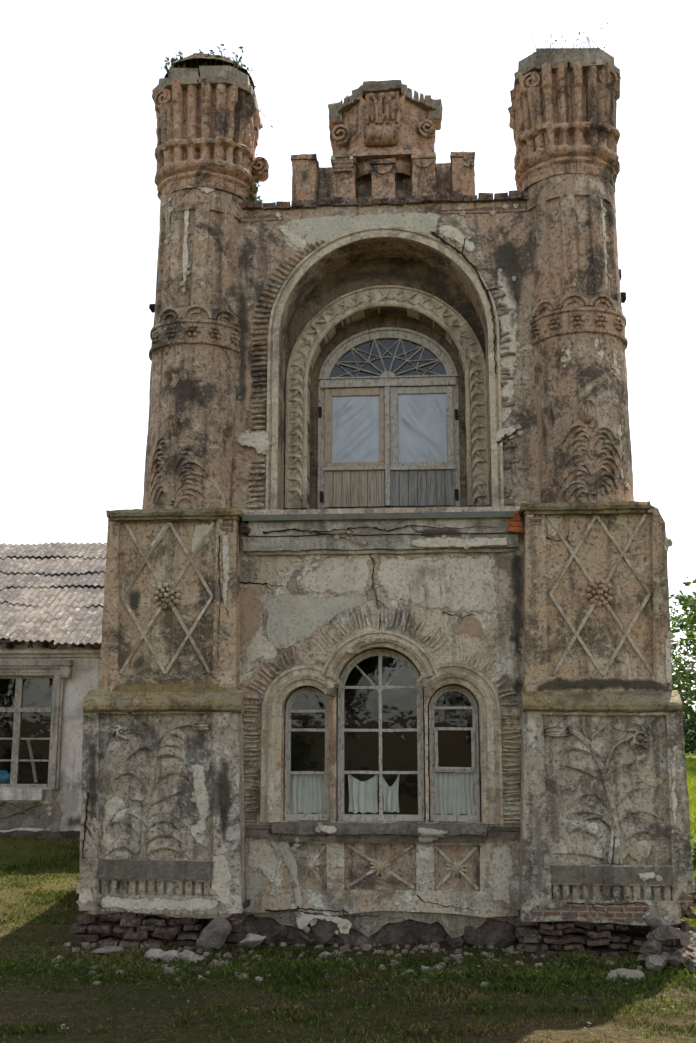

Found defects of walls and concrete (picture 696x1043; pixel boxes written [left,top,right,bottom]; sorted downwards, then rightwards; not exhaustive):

peeling [191,519,258,607]
crack [364,557,381,630]
crack [263,525,498,538]
peeling [286,530,508,616]
peeling [242,595,278,673]
peeling [74,761,236,915]
peeling [246,837,278,896]